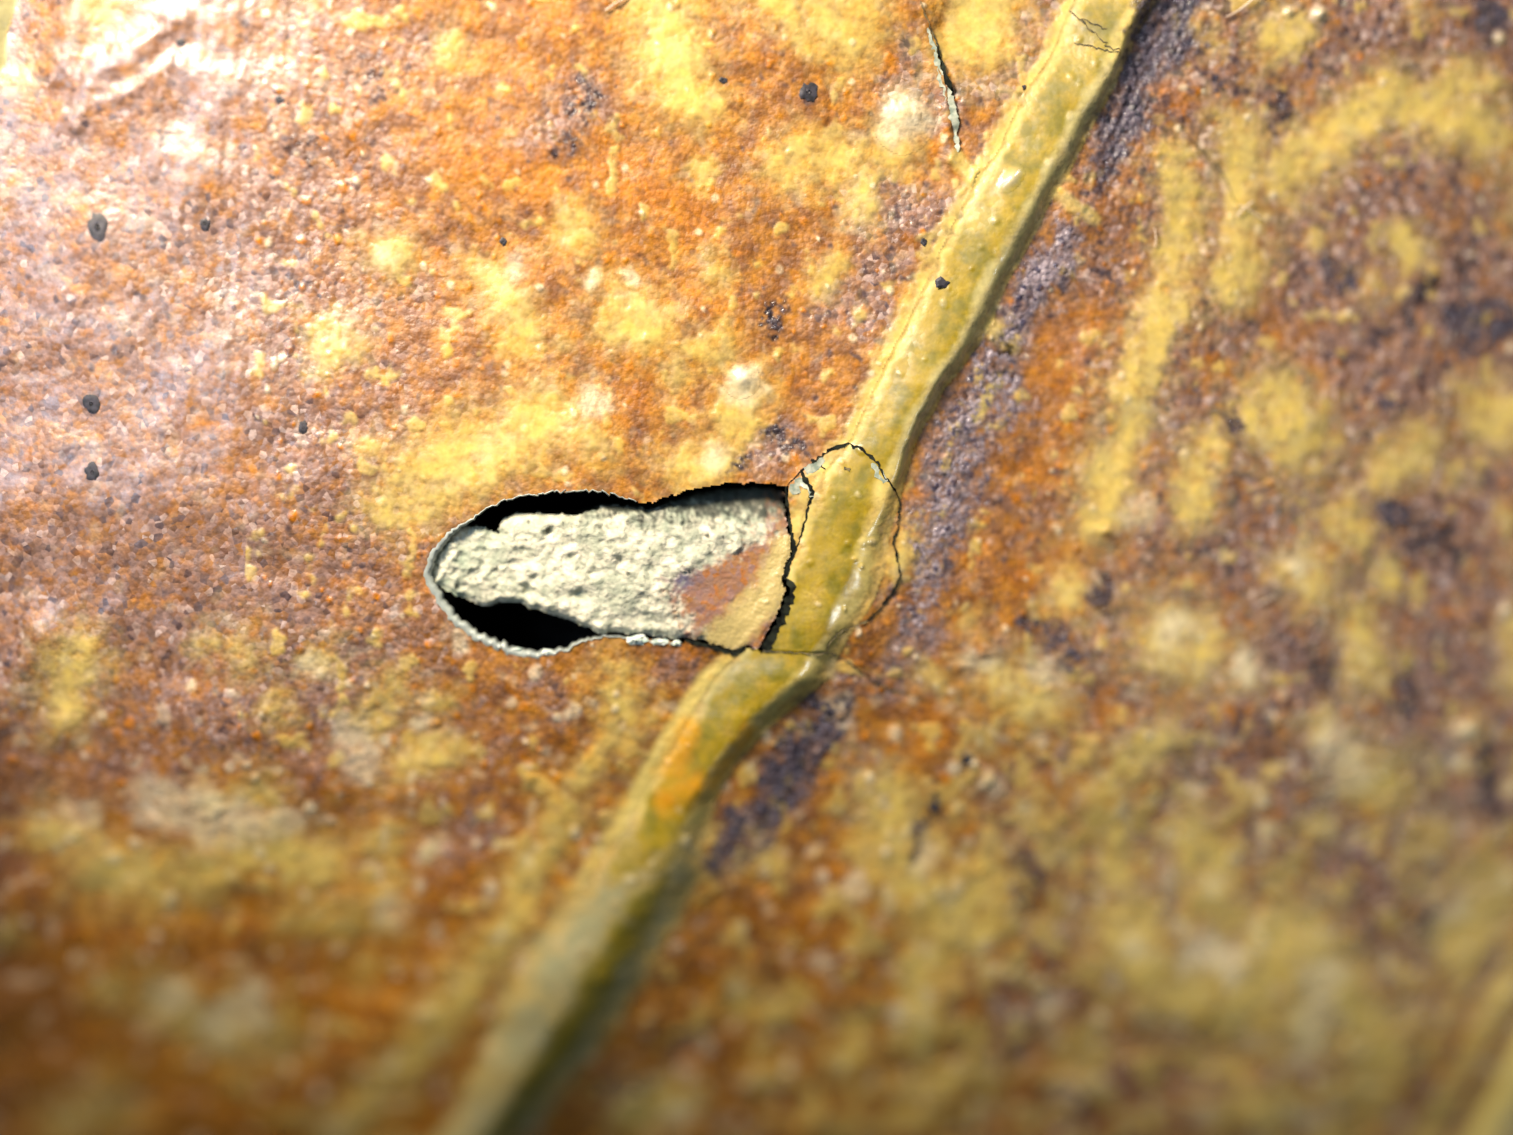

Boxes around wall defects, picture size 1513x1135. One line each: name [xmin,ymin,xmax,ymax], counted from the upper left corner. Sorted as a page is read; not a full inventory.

spalling [423,444,900,659]
crack [685,442,931,702]